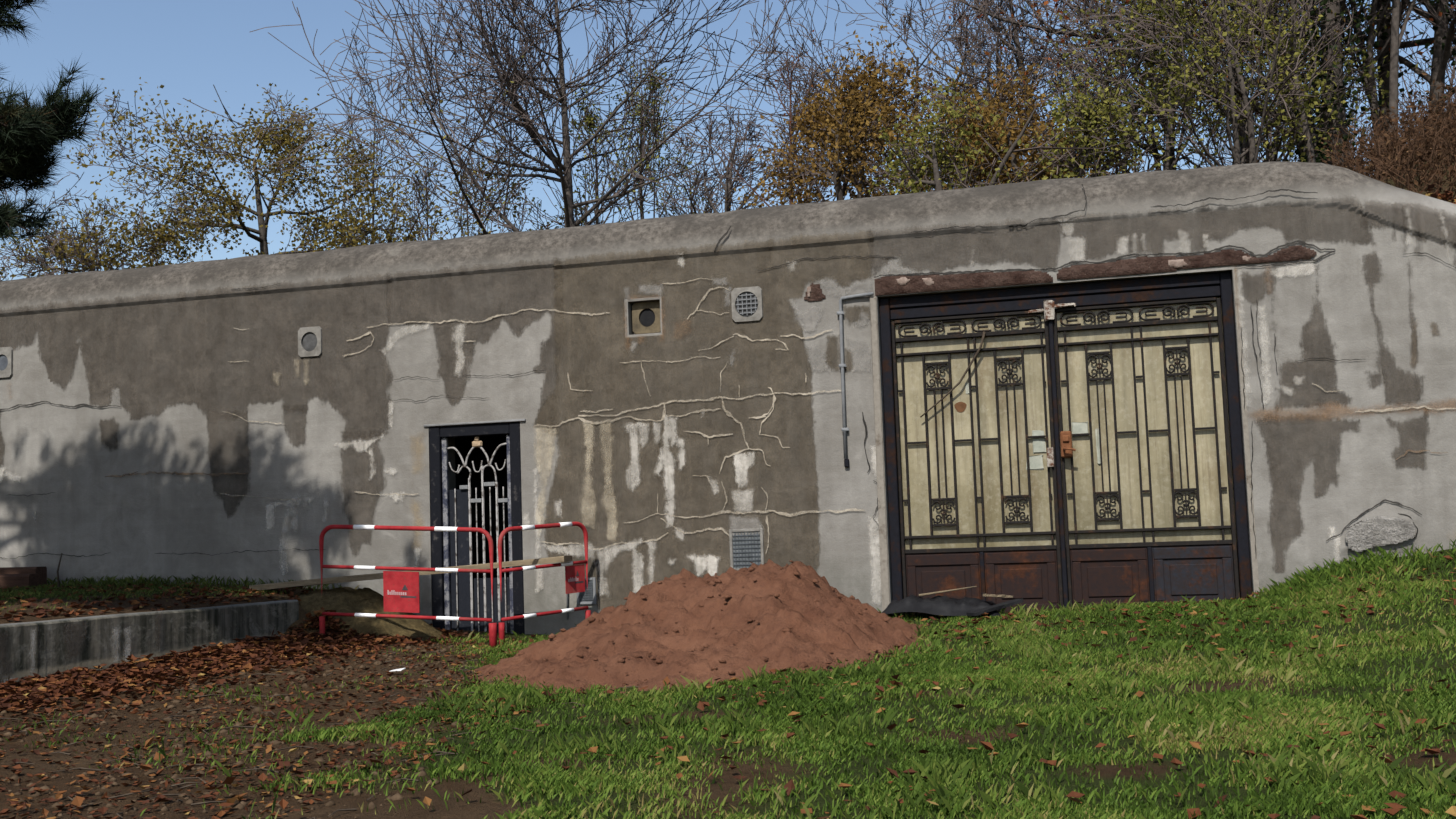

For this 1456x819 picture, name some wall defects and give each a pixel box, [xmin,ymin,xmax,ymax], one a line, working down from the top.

crack [342,226,879,554]
water stain [0,197,1456,610]
crack [758,184,1456,553]